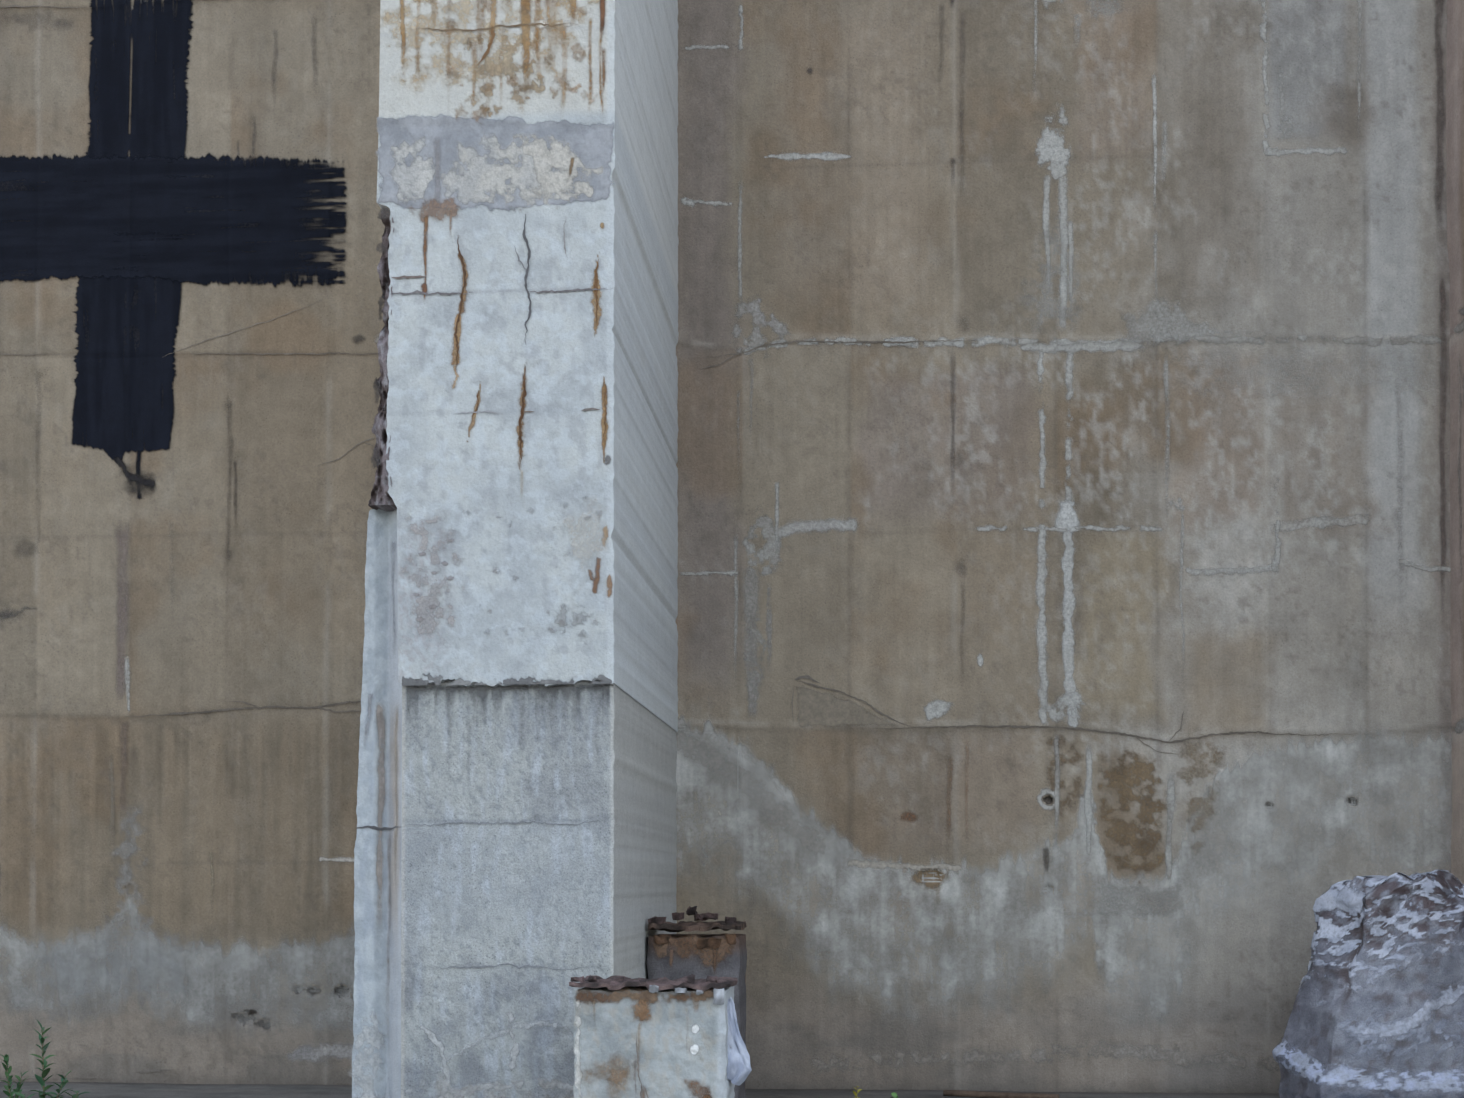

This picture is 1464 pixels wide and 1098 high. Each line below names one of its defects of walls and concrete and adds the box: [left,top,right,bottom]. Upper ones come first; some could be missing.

rust [383,0,605,105]
rust [419,198,458,298]
crack [392,239,535,414]
peeling [368,35,614,512]
crack [515,214,613,343]
damp [681,107,1464,572]
rust [516,366,527,469]
rust [601,379,611,465]
damp [407,685,609,702]
damp [676,409,1464,1017]
crack [791,675,1367,755]
damp [0,728,384,1098]